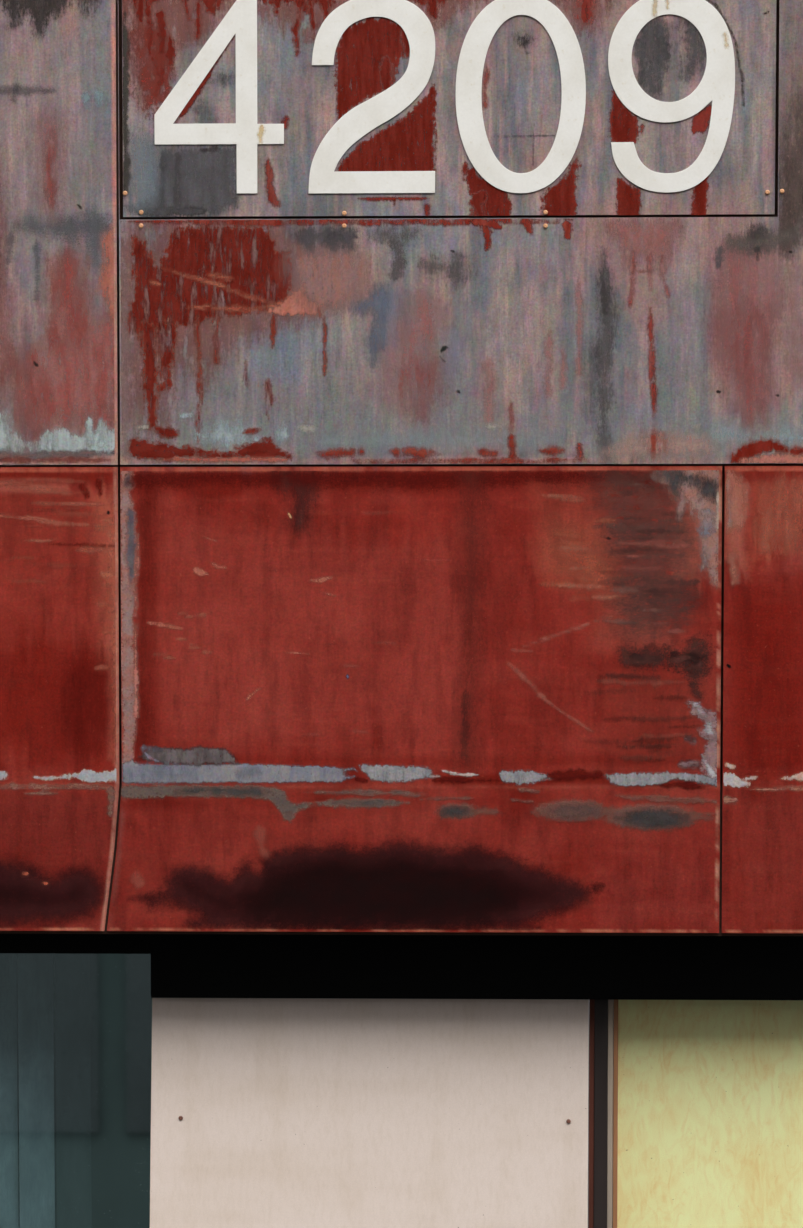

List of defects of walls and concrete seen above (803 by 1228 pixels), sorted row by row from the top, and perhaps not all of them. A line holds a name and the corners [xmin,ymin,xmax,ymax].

damp [0,0,98,36]
rust [257,0,348,40]
rust [122,0,236,120]
rust [15,158,584,464]
damp [0,409,115,460]
rust [731,436,803,463]
rust [420,776,492,801]
peeling [499,769,550,785]
rust [621,782,737,815]
peeling [781,772,803,781]
damp [0,863,104,926]
damp [150,842,589,930]